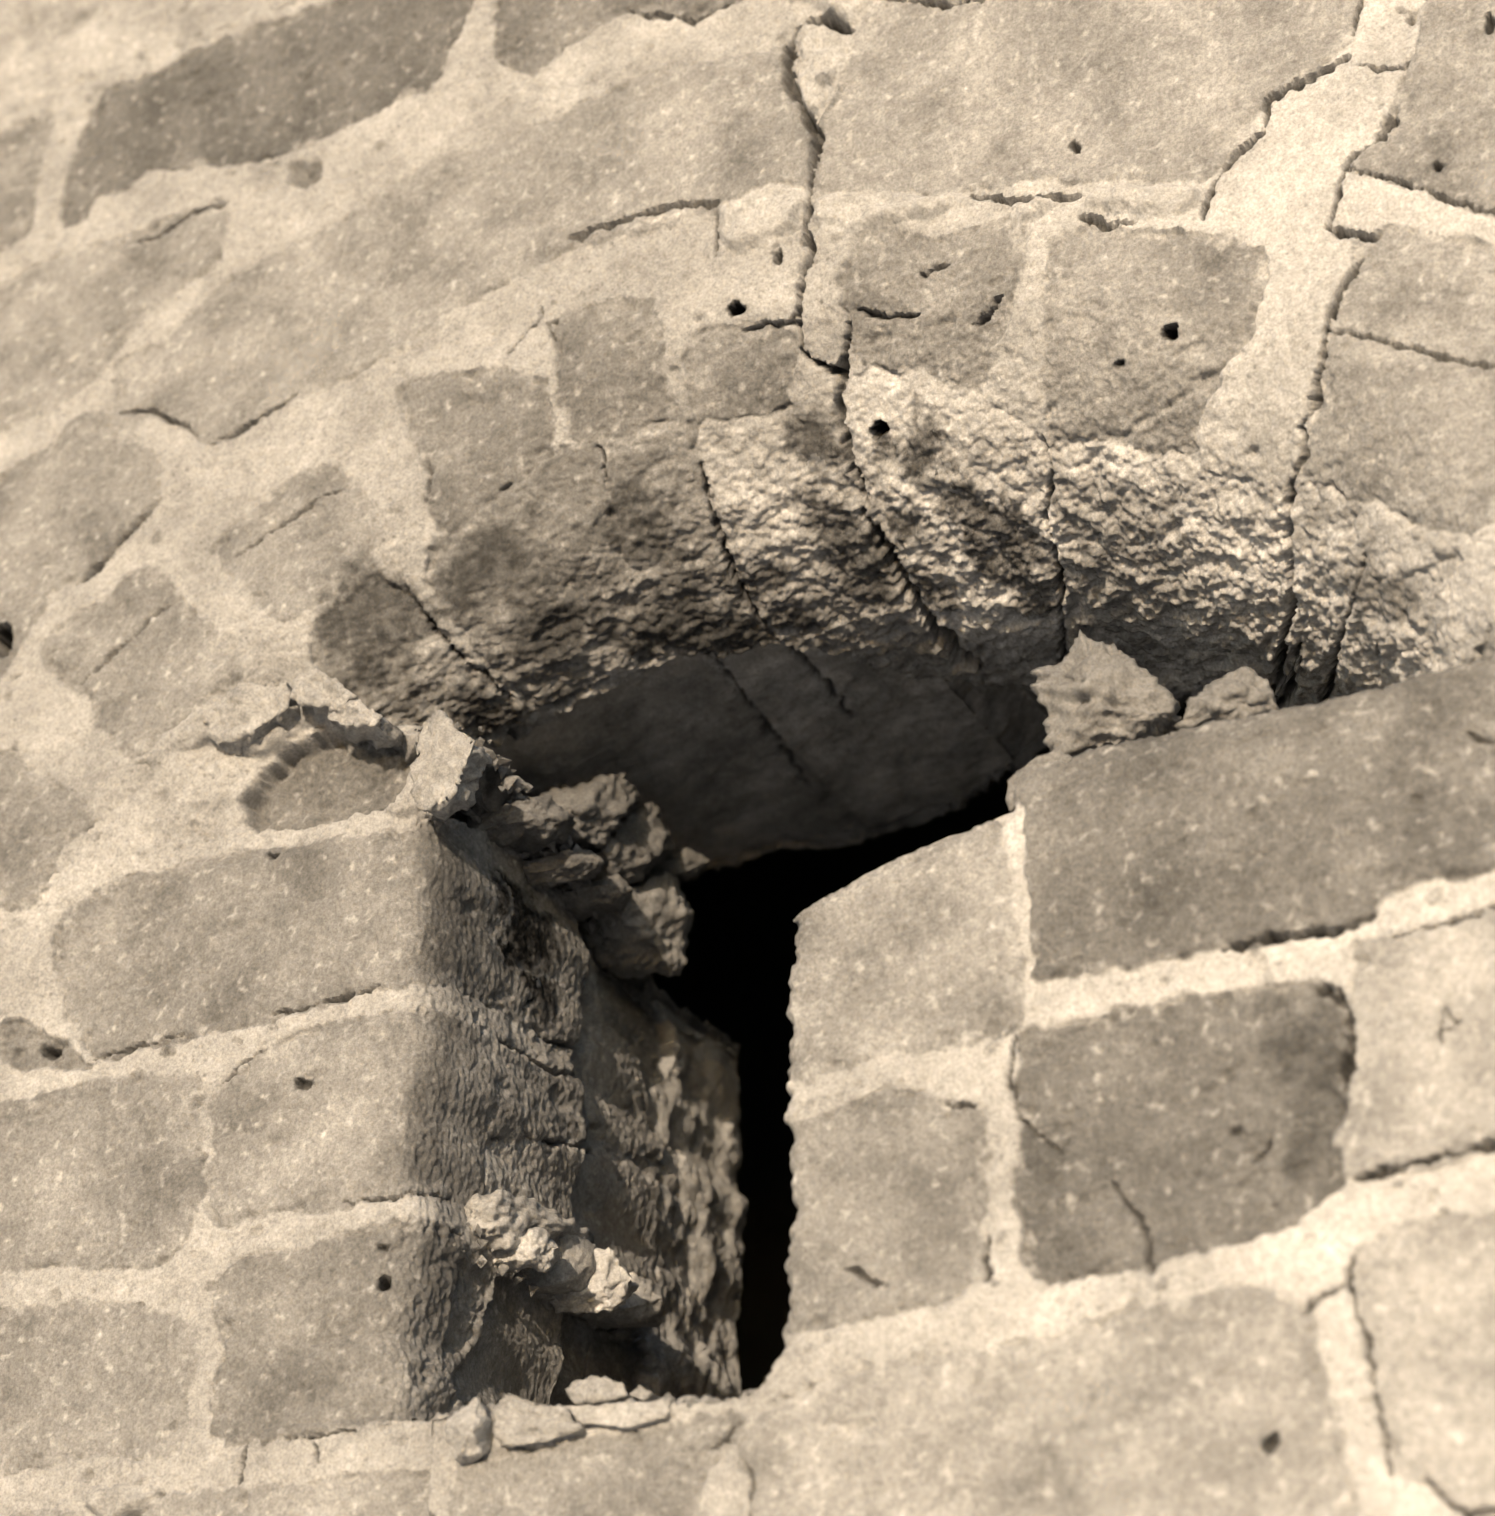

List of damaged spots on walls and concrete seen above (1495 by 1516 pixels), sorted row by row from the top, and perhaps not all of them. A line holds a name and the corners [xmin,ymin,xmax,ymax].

crack [628,2,735,27]
crack [888,0,985,11]
crack [1200,0,1414,221]
crack [970,191,1138,233]
leakage [785,416,848,463]
crack [739,7,987,671]
leakage [797,410,1104,617]
crack [1270,108,1495,710]
leakage [316,525,524,688]
leakage [517,598,820,657]
leakage [460,685,526,729]
leakage [487,869,565,1023]